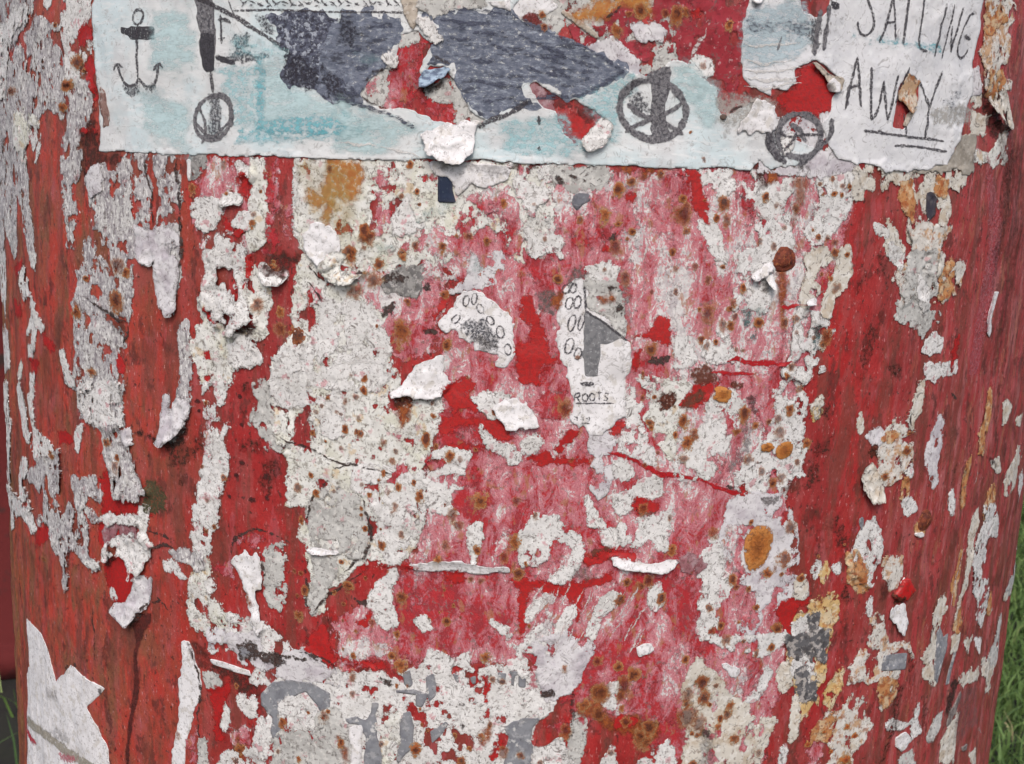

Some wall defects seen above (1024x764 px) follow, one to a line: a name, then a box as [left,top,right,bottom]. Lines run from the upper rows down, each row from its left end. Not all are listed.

peeling [513,0,749,100]
rust [307,159,364,230]
rust [342,223,375,266]
rust [704,195,730,228]
peeling [0,0,300,764]
peeling [415,389,517,516]
rust [732,363,811,488]
peeling [775,164,1023,764]
peeling [366,568,434,634]
peeling [466,494,674,704]
rust [744,519,791,579]
rust [576,657,659,752]